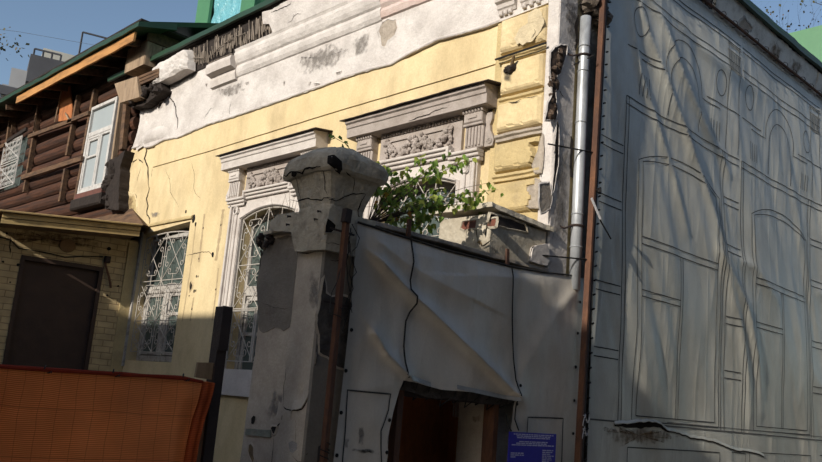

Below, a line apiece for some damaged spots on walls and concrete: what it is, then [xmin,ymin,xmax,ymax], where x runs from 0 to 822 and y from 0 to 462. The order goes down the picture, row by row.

peeling [377,17,400,49]
peeling [514,8,544,45]
crack [128,148,177,224]
crack [283,166,377,217]
crack [256,339,318,462]